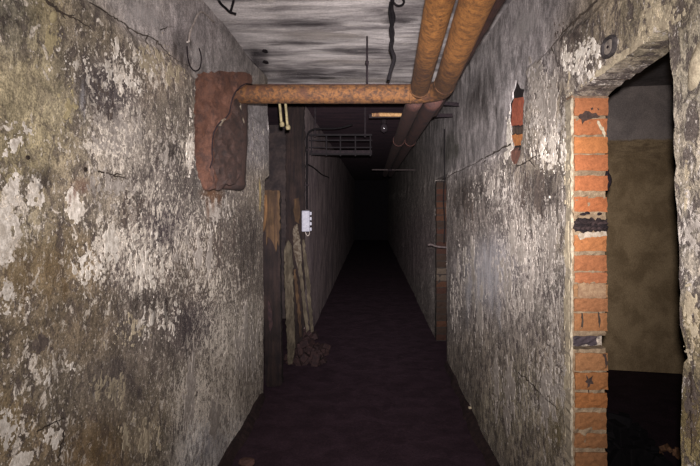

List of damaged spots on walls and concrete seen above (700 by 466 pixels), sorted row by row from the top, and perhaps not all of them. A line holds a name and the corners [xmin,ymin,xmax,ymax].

crack [45,0,92,30]
crack [89,2,189,66]
crack [441,143,511,181]
peeling [450,6,686,447]